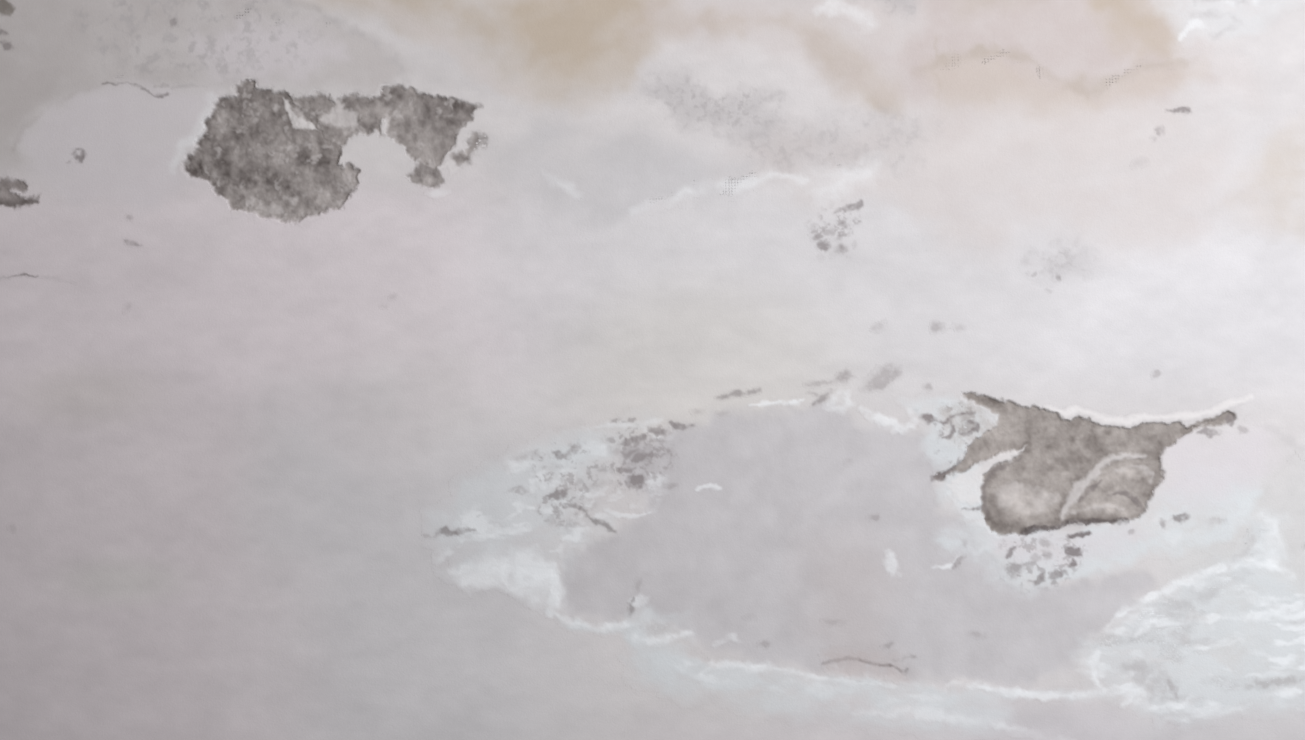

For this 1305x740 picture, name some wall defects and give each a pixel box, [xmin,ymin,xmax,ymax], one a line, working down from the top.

spalling [0,175,42,211]
spalling [181,79,489,227]
water stain [0,0,1305,295]
peeling [422,524,478,540]
water stain [419,391,1305,740]
peeling [504,362,1305,690]